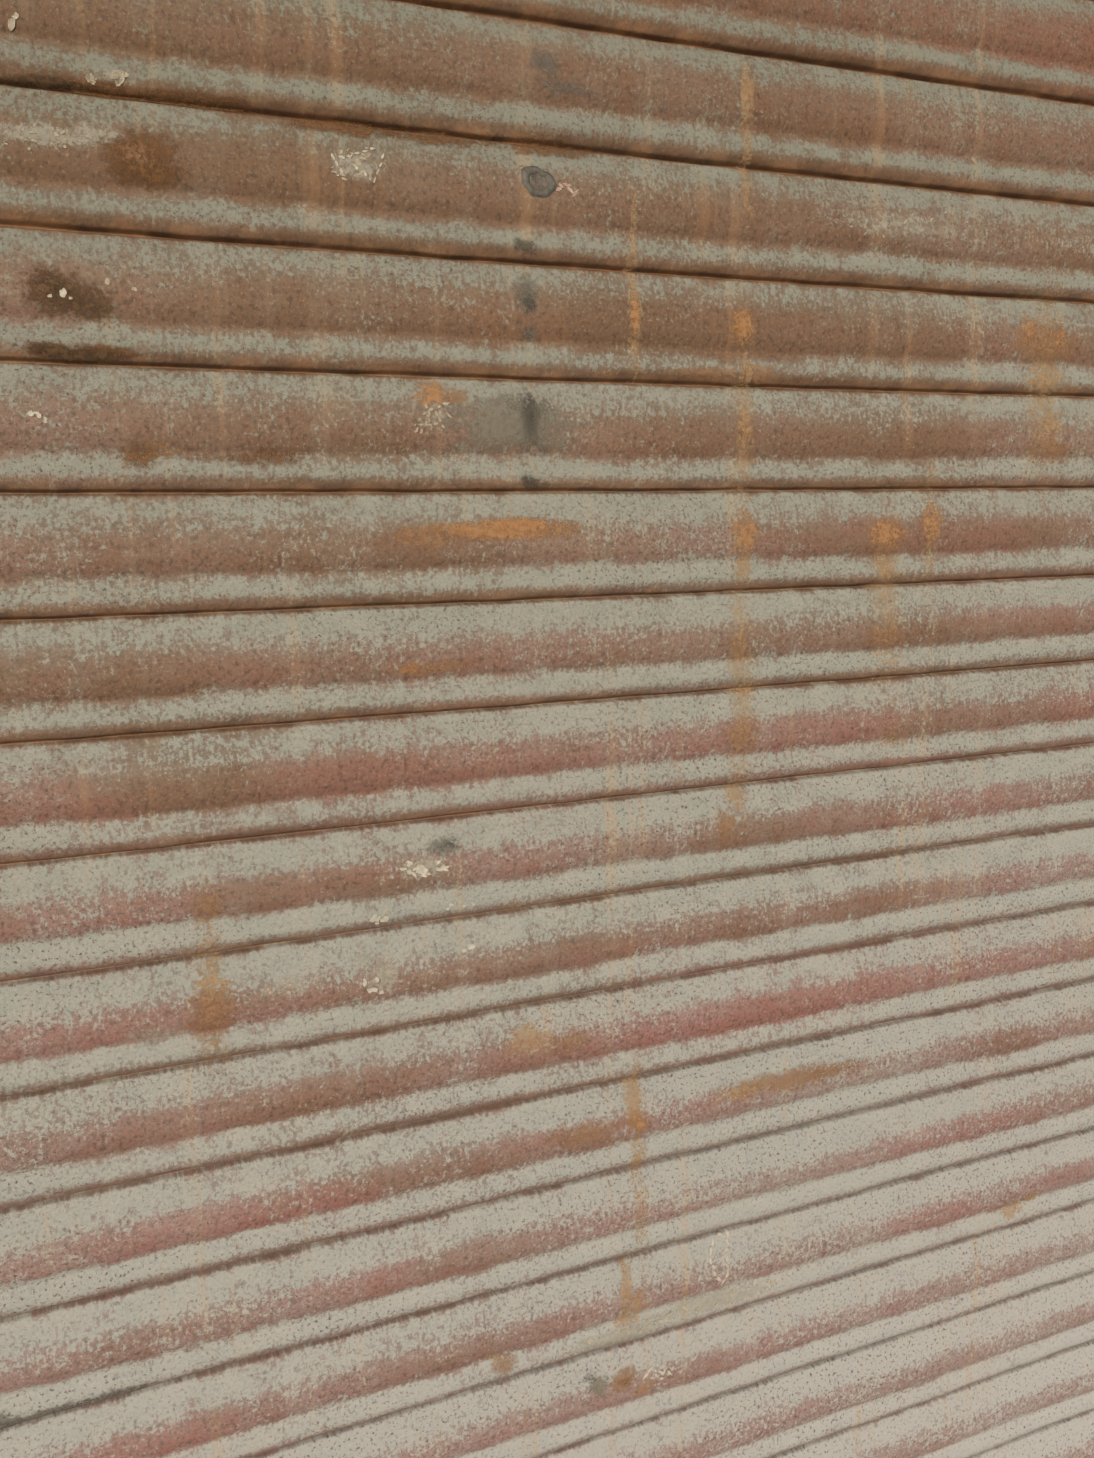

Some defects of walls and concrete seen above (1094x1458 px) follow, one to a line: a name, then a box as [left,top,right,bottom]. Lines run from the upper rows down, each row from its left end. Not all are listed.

rust [102,131,180,189]
rust [28,269,112,320]
rust [730,304,754,346]
rust [396,516,578,550]